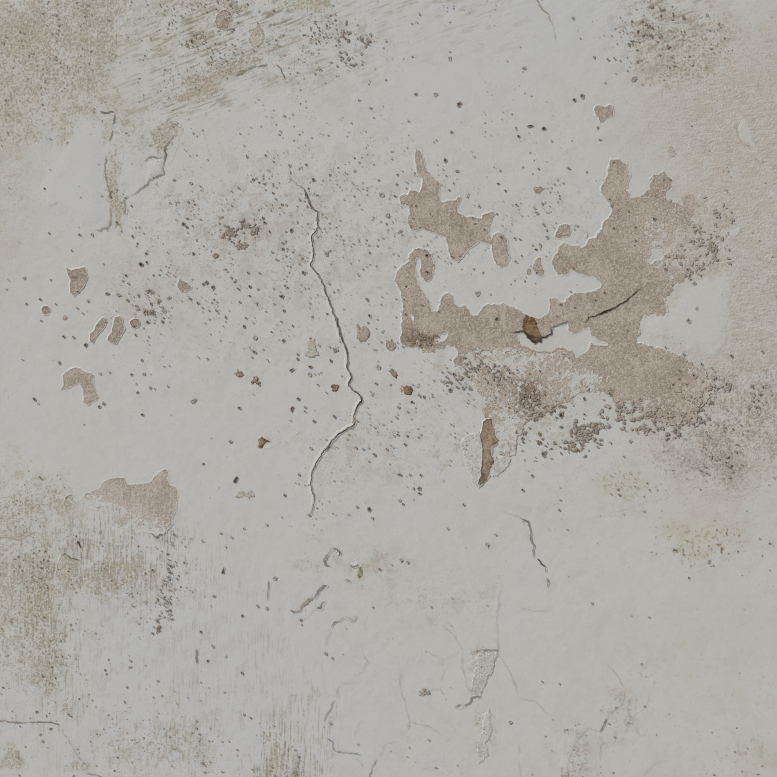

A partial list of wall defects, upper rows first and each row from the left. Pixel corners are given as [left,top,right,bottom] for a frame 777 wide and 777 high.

peeling [379,139,522,269]
peeling [64,266,89,314]
peeling [58,361,110,409]
peeling [84,274,170,348]
peeling [176,277,214,304]
crack [288,178,362,513]
peeling [386,157,741,489]
peeling [63,468,191,634]